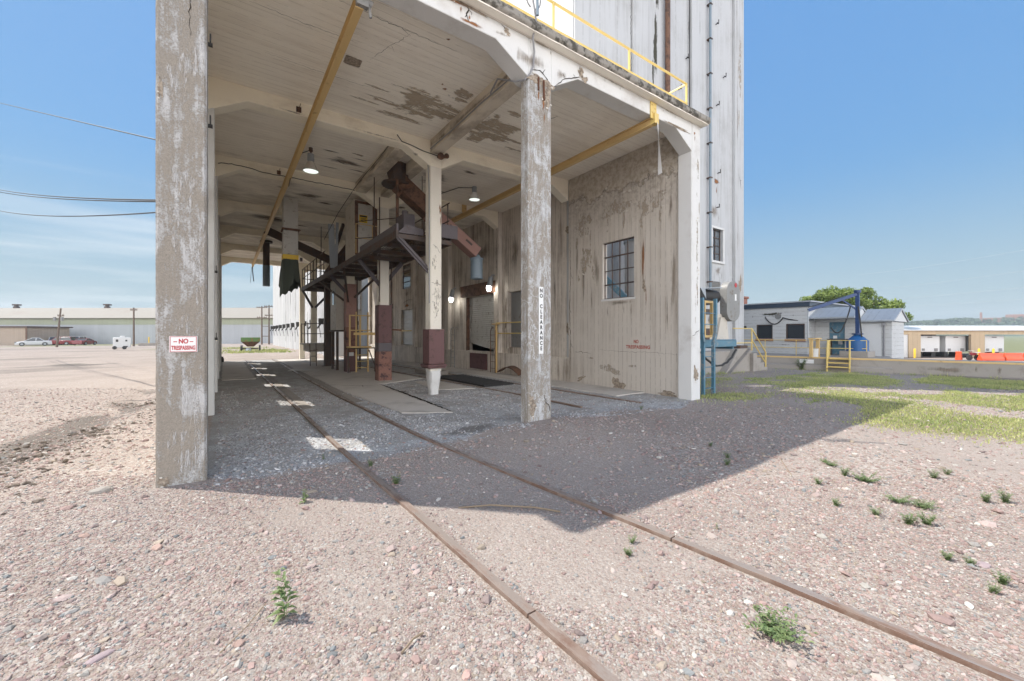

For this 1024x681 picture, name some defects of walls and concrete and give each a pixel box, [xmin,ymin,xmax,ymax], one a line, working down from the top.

peeling [350,83,473,124]
peeling [467,111,536,158]
spalling [586,357,633,389]